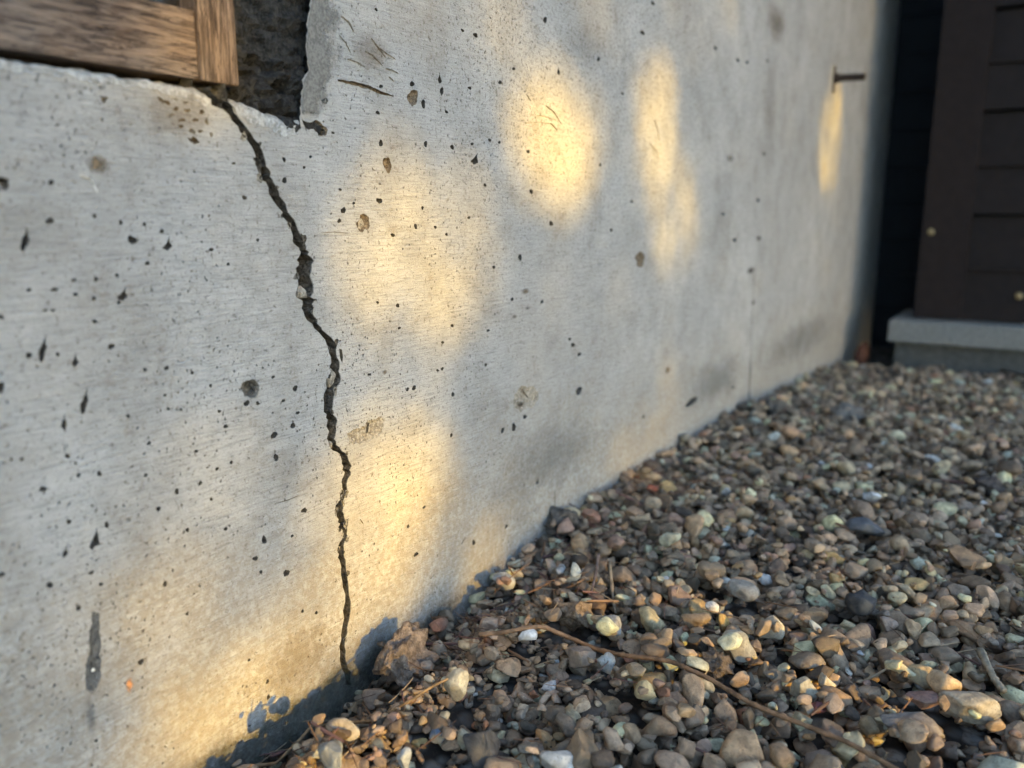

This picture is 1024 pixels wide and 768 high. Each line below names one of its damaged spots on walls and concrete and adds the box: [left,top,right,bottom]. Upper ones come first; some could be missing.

crack [197,83,352,684]